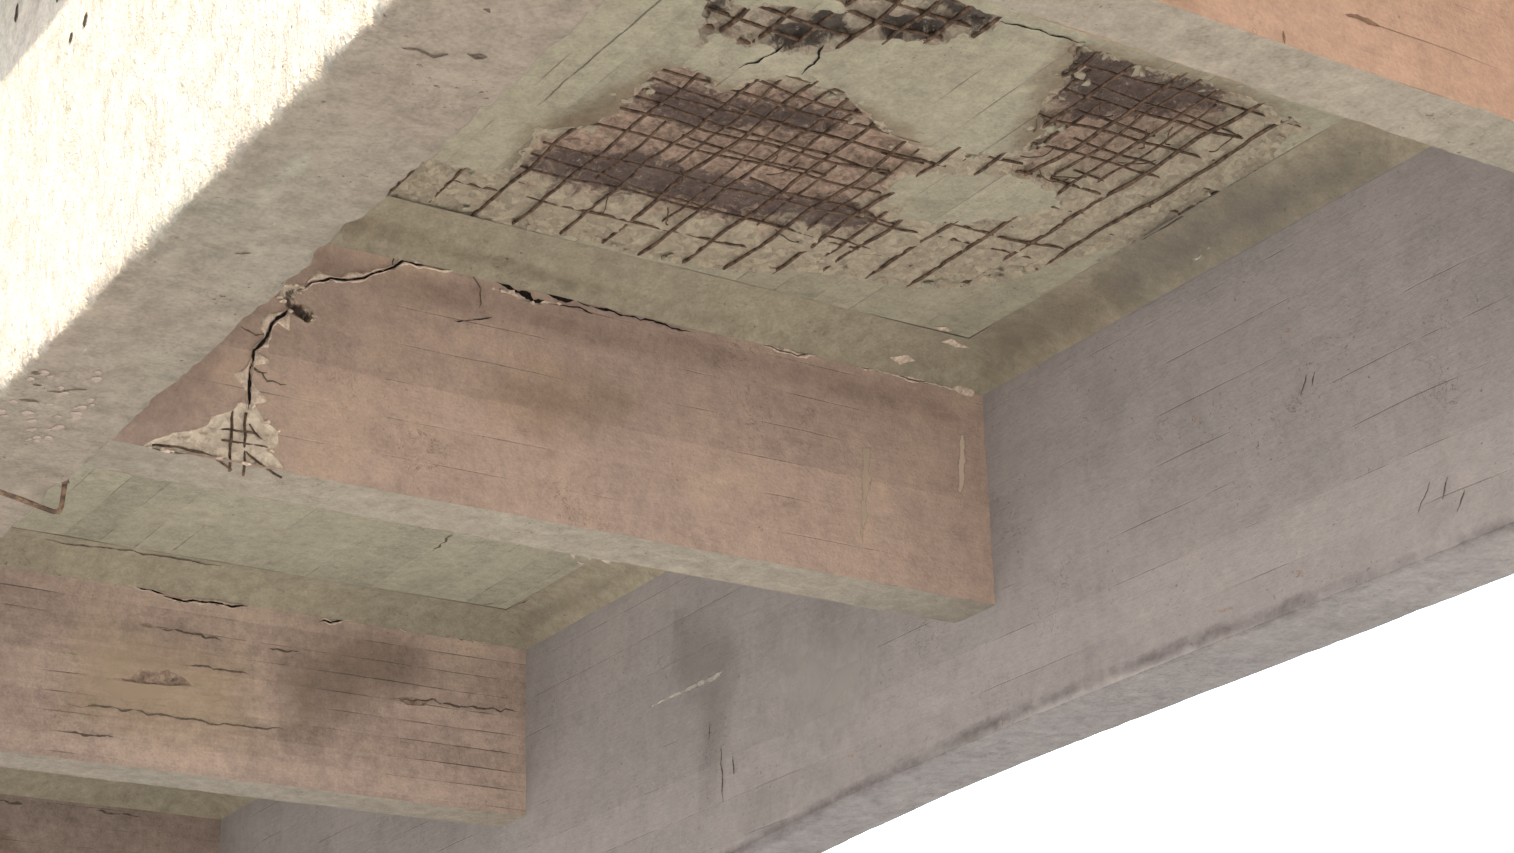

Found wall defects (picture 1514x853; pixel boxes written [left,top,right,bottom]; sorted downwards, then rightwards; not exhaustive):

spalling [695,0,1004,56]
spalling [384,42,1311,291]
crack [234,258,690,409]
spalling [144,402,283,479]
crack [47,539,299,675]
crack [321,617,351,625]
crack [67,704,286,737]
crack [394,698,517,712]